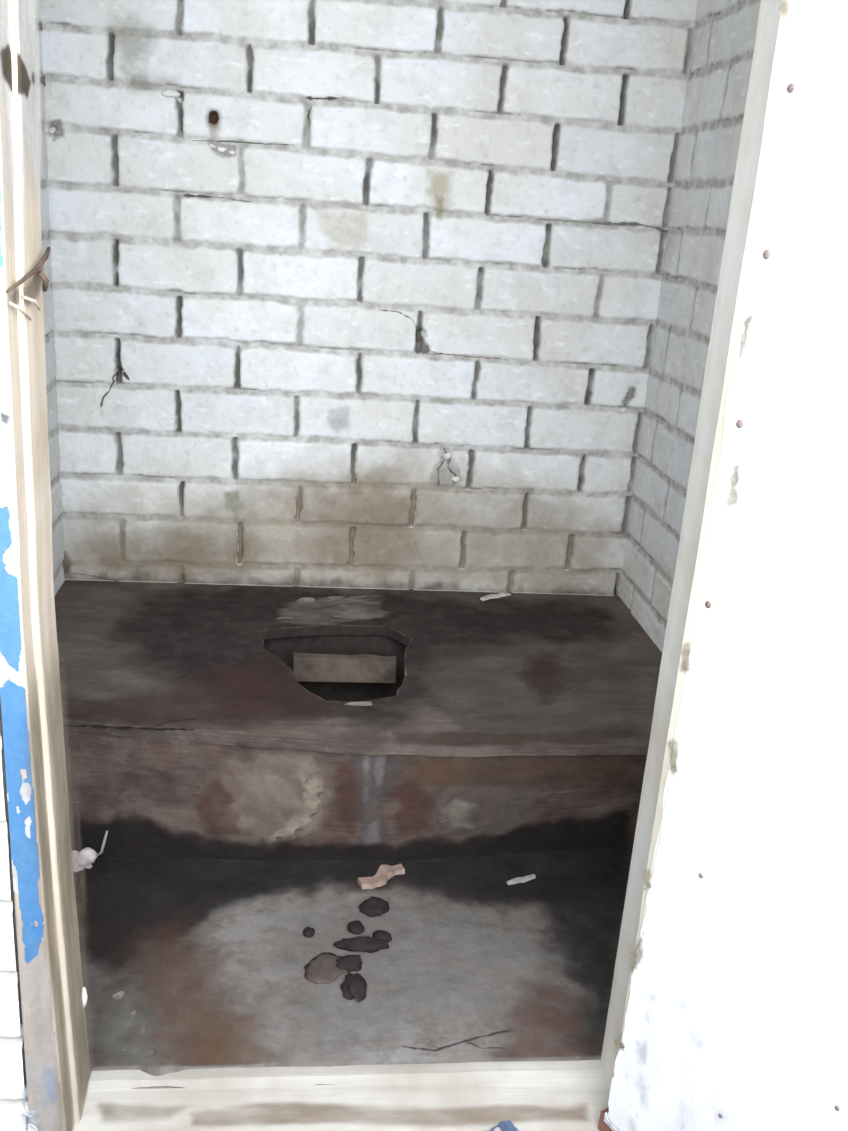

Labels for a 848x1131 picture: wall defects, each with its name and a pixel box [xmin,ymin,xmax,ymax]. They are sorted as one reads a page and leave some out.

corrosion [209,111,219,124]
damp [155,480,593,594]
damp [71,755,633,1055]
peeling [23,1088,38,1131]